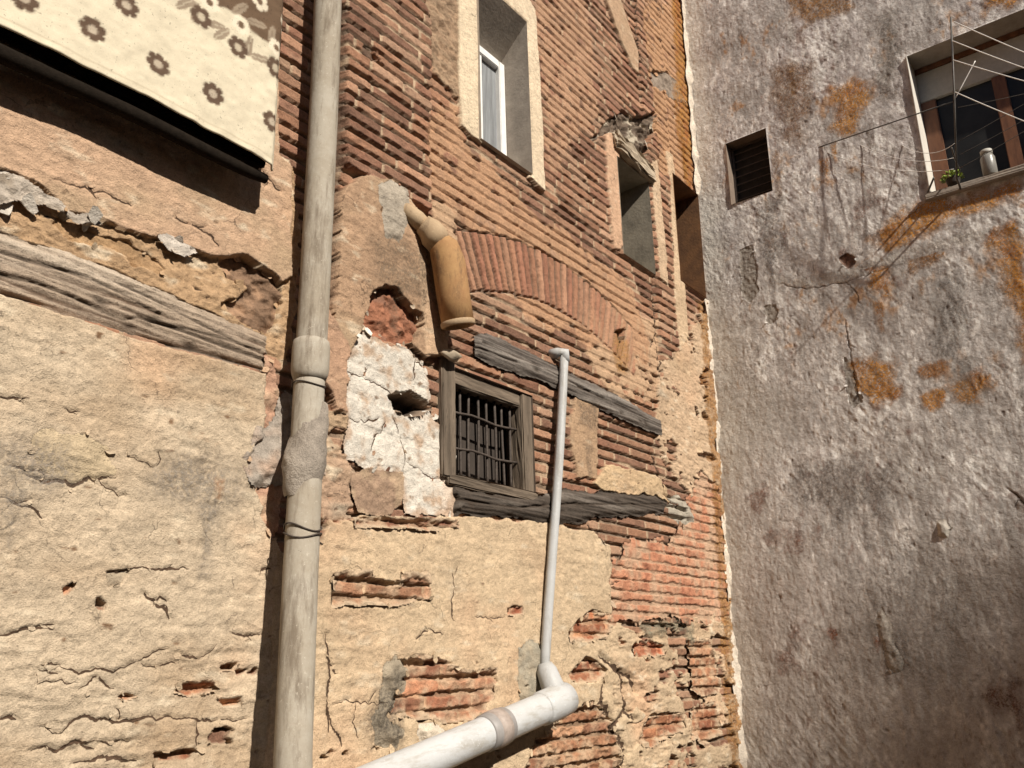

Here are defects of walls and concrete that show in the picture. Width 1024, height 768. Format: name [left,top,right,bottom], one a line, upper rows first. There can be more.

corrosion [828,78,875,135]
peeling [0,170,165,275]
corrosion [868,182,1022,251]
peeling [343,289,462,531]
corrosion [850,357,901,404]
corrosion [917,360,997,411]
crack [108,563,189,619]
crack [0,624,55,636]
crack [0,632,260,763]
crack [325,635,387,747]
spalling [386,651,498,726]
spalling [525,699,622,768]